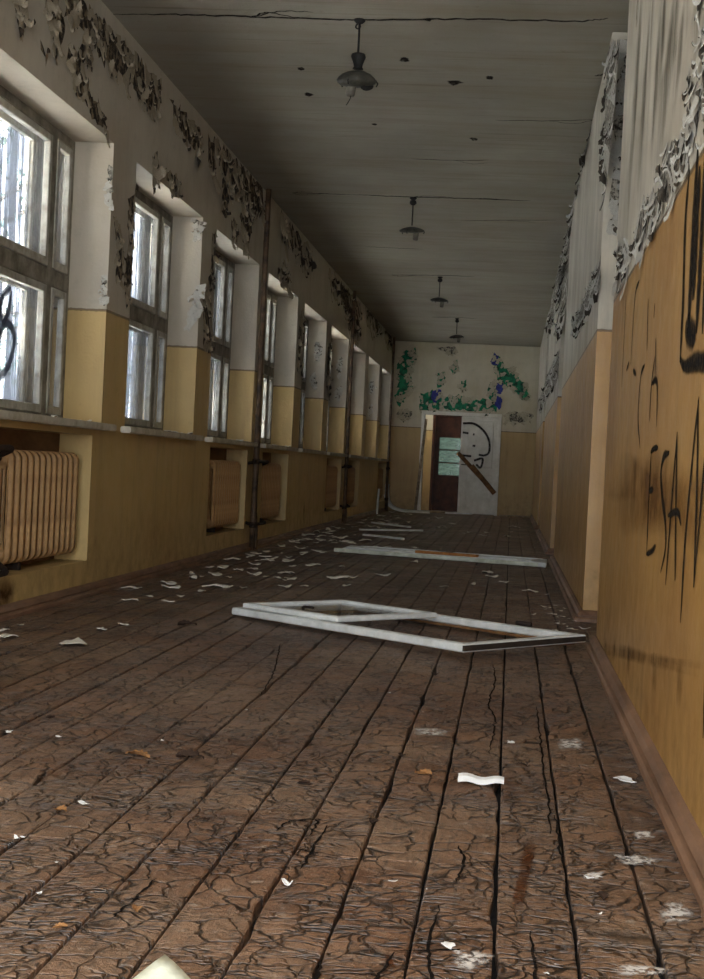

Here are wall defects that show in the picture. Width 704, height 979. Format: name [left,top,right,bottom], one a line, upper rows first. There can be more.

crack [113,10,608,22]
peeling [12,0,266,260]
peeling [277,210,317,299]
peeling [328,0,704,426]
peeling [297,308,343,401]
crack [487,667,497,754]
crack [522,706,587,865]
crack [274,818,338,869]
crack [455,845,496,881]
crack [314,905,460,979]
crack [529,931,575,979]